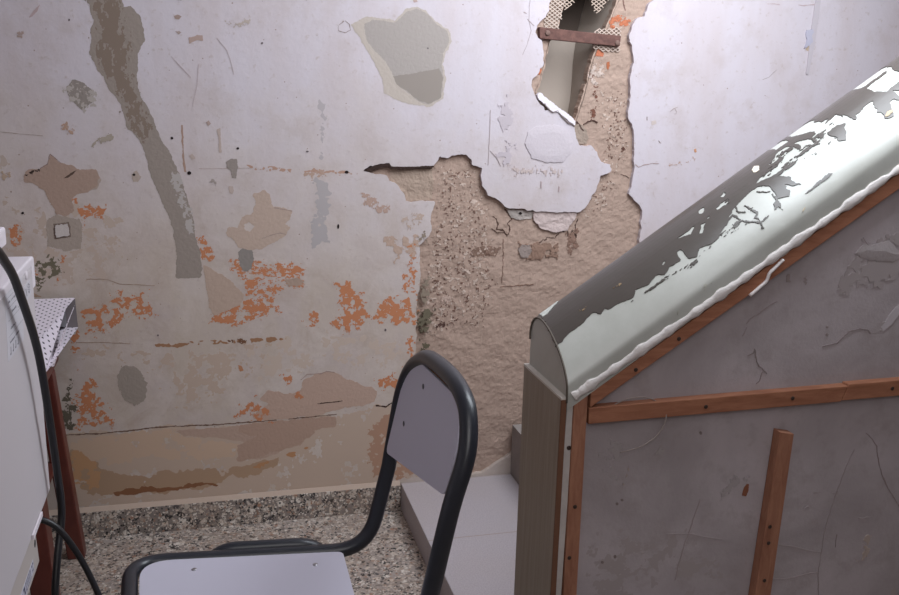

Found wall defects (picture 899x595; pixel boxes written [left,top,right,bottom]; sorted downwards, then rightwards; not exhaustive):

rust [538,27,621,47]
flaking render [24,155,107,238]
peeling [196,235,215,262]
flaking render [208,190,305,327]
flaking render [330,0,899,472]
rust [155,337,283,348]
leakage [79,330,406,410]
leakage [416,276,436,351]
leakage [62,378,391,507]
leakage [393,461,418,480]